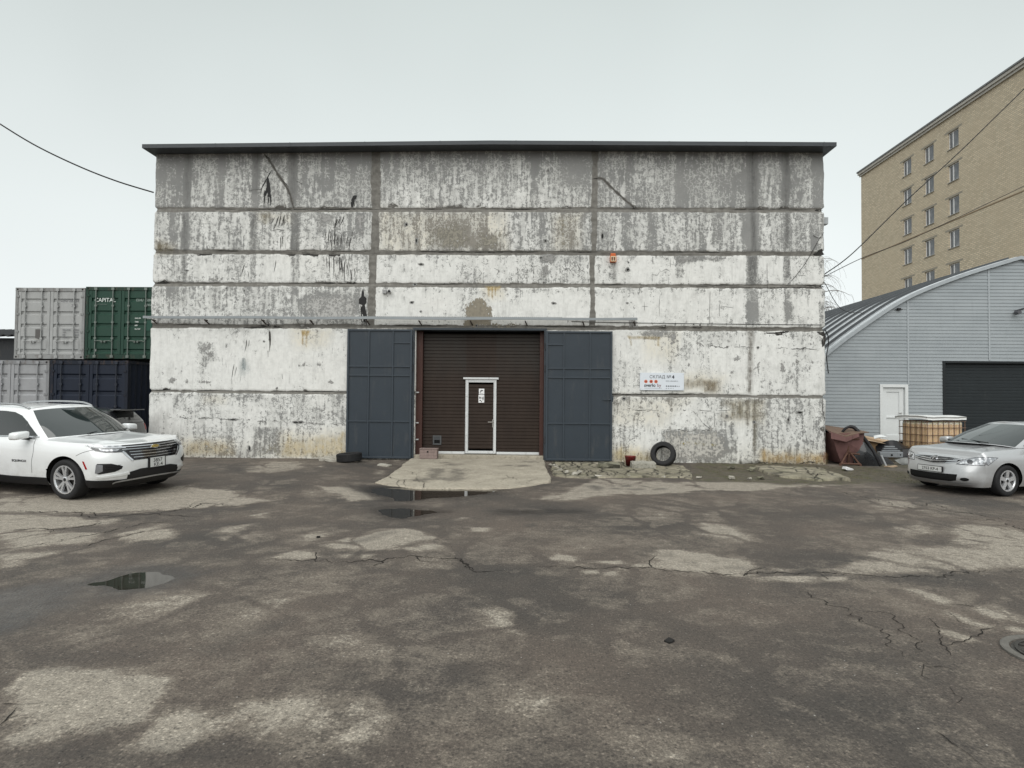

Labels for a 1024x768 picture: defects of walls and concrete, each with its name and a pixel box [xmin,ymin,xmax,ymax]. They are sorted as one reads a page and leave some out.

crack [243,154,302,208]
crack [593,177,639,210]
peeling [249,204,366,236]
peeling [539,239,555,283]
peeling [297,282,357,329]
peeling [463,297,520,328]
peeling [659,423,732,462]
crack [288,552,488,572]
crack [536,557,1023,702]